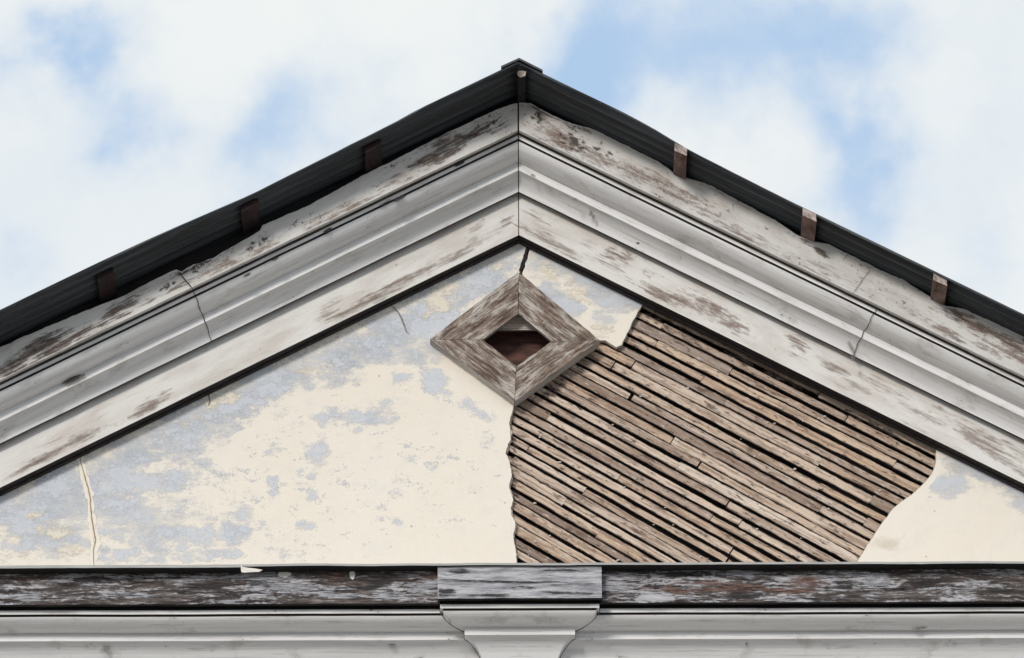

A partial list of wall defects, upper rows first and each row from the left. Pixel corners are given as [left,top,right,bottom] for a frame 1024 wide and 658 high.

peeling [288,113,508,233]
peeling [524,105,732,228]
crack [179,272,212,342]
spalling [0,248,1024,611]
crack [77,456,101,565]